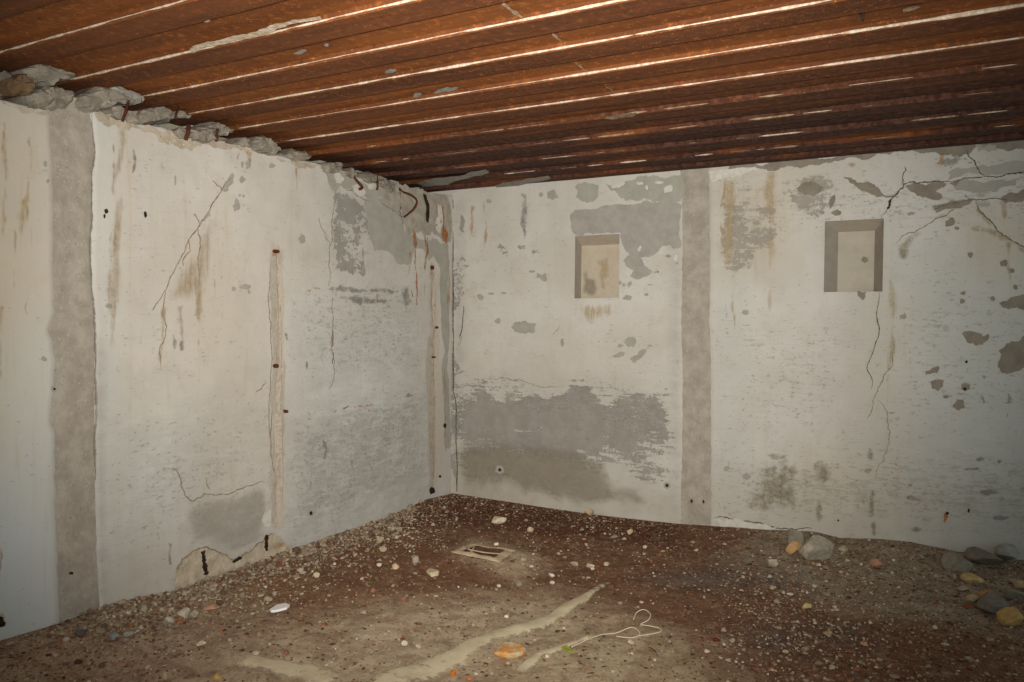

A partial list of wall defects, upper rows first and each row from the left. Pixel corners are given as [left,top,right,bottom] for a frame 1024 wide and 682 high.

peeling [728,140,1024,217]
crack [881,150,1023,247]
crack [152,180,229,364]
spalling [2,97,256,622]
peeling [269,158,776,530]
crack [867,301,895,471]
peeling [926,366,970,410]
peeling [962,331,989,346]
peeling [998,336,1024,374]
spalling [174,533,291,591]